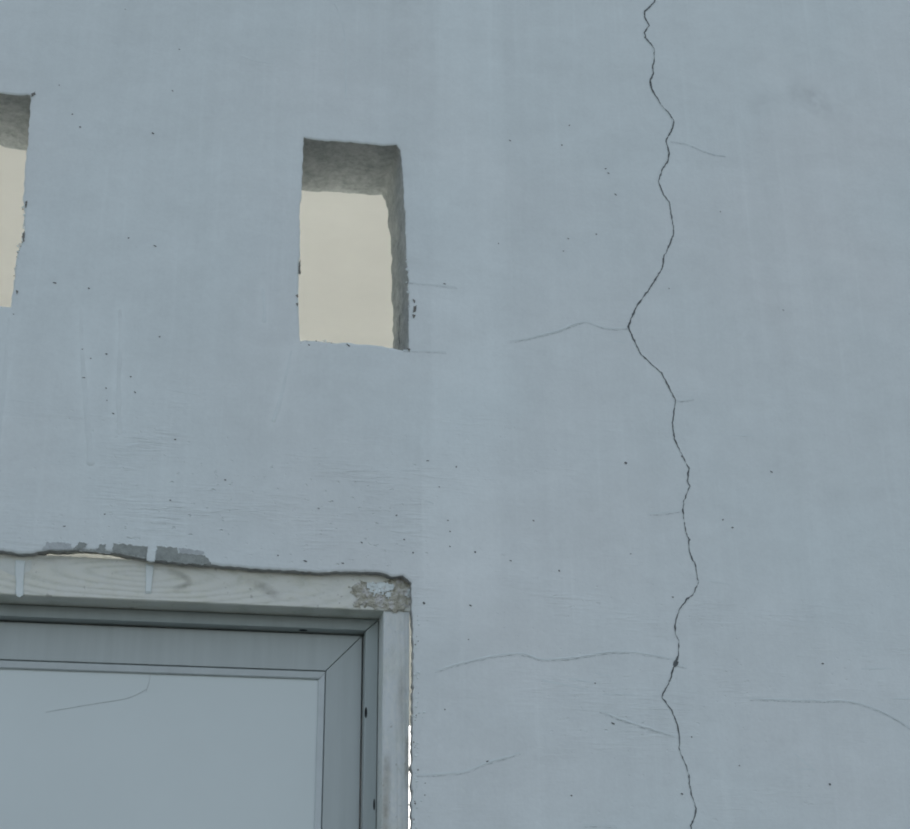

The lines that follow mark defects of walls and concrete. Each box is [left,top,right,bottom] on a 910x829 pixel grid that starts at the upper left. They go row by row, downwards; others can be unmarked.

crack [510,0,725,829]
peeling [42,542,211,565]
spalling [348,578,411,613]